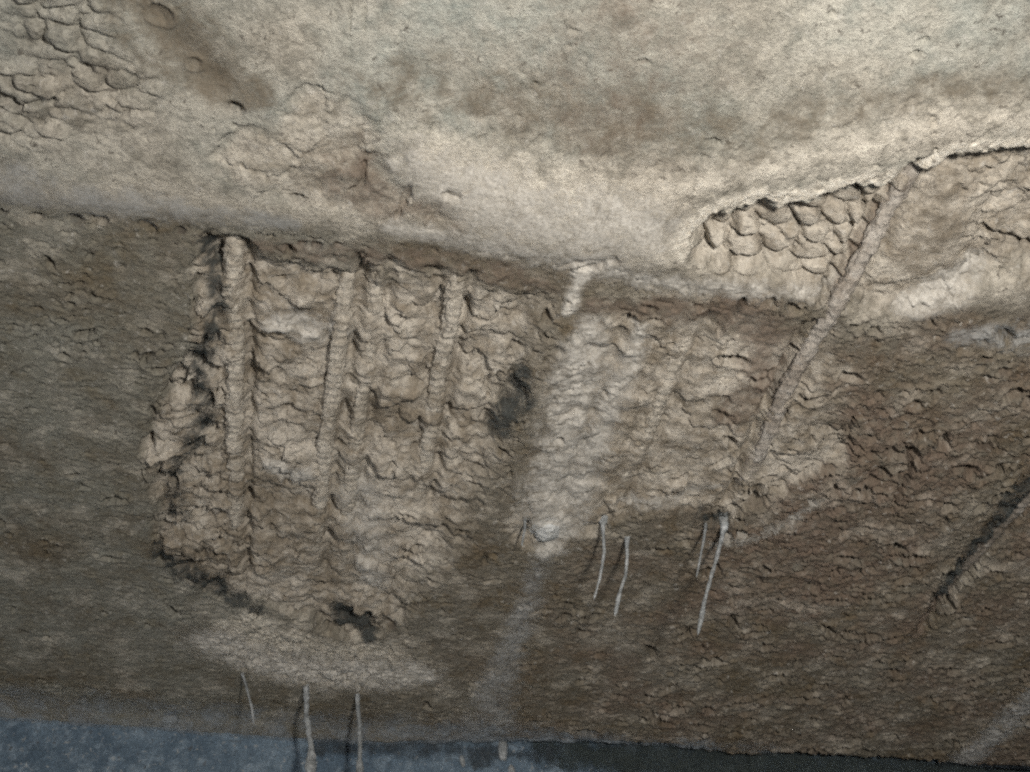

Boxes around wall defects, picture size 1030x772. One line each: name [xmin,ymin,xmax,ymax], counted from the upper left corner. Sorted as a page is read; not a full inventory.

spalling [207,82,474,231]
spalling [134,140,1030,646]
leakage [383,150,783,559]
crack [974,441,1030,461]
leakage [314,608,573,770]